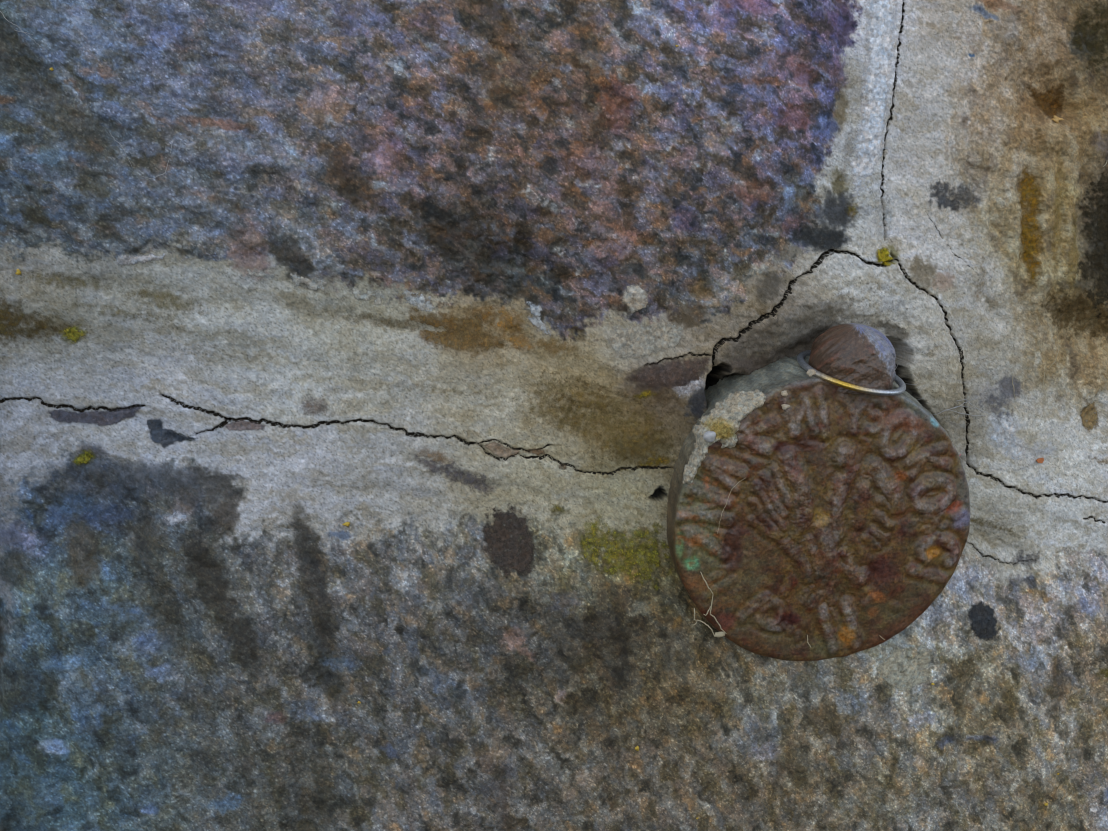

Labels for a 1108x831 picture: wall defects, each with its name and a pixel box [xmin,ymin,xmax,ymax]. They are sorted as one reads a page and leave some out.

crack [880,2,905,226]
crack [0,394,673,475]
crack [645,249,1108,524]
crack [969,543,1028,565]